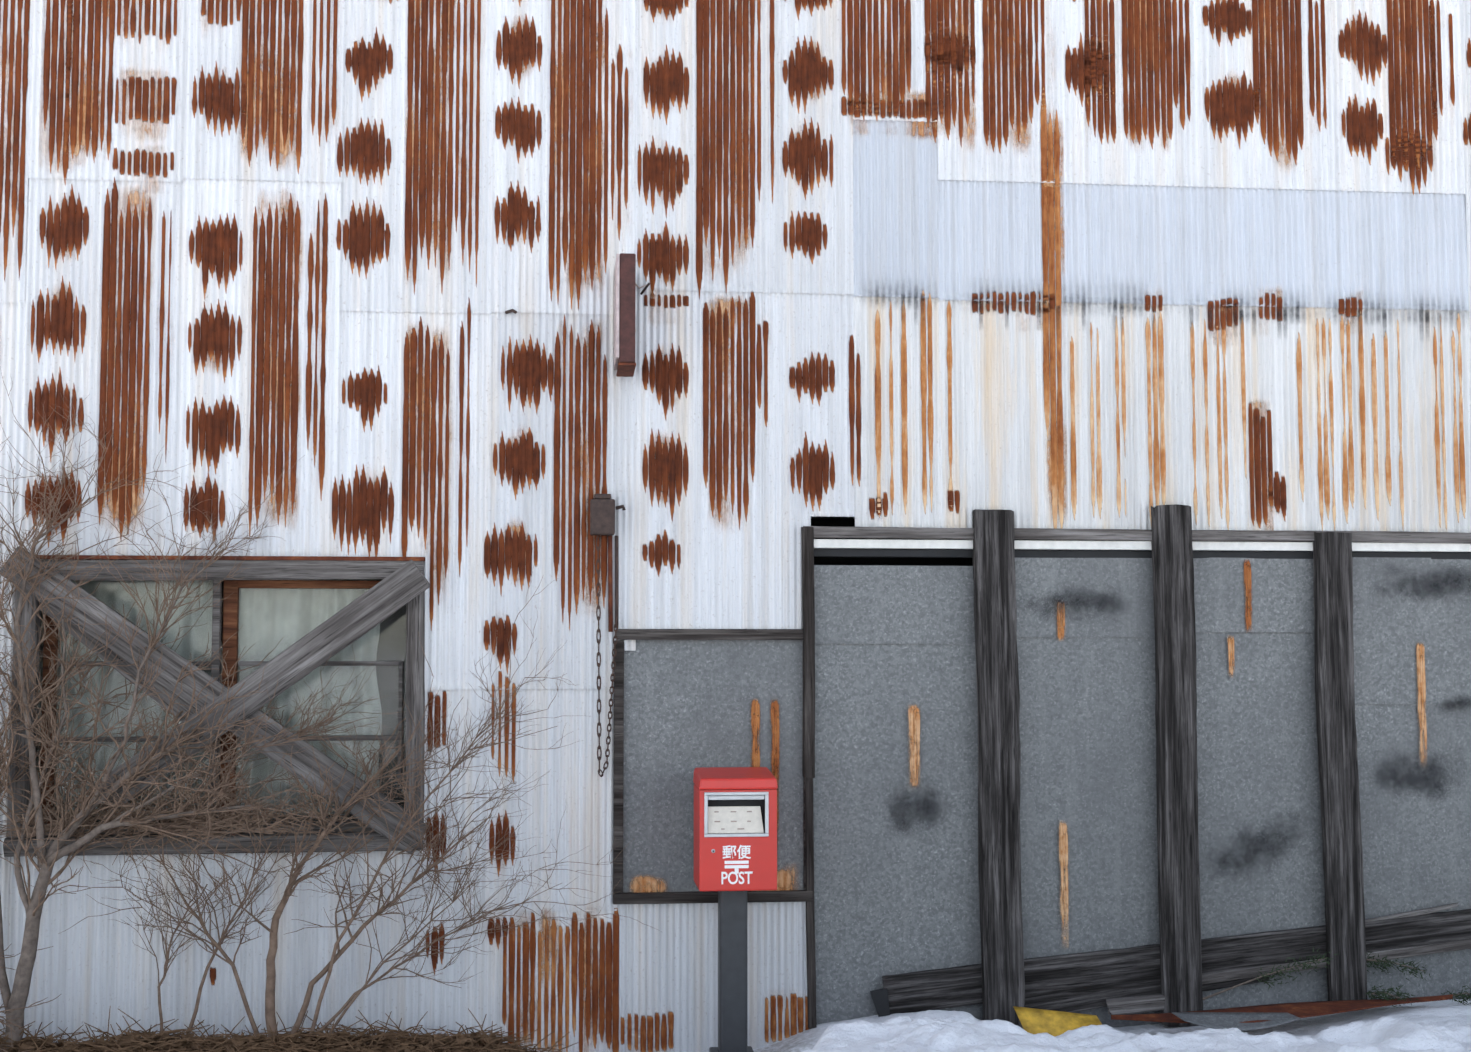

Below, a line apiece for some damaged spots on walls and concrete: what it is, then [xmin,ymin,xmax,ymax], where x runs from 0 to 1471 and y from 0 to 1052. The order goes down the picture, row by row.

corrosion [1065,0,1471,195]
corrosion [0,0,1126,631]
corrosion [1145,295,1166,521]
corrosion [1190,292,1404,531]
corrosion [1433,313,1466,529]
corrosion [427,691,447,751]
corrosion [484,615,517,782]
corrosion [489,810,516,877]
corrosion [751,700,779,850]
corrosion [1059,823,1068,939]
corrosion [1416,643,1427,763]
corrosion [487,908,674,1052]